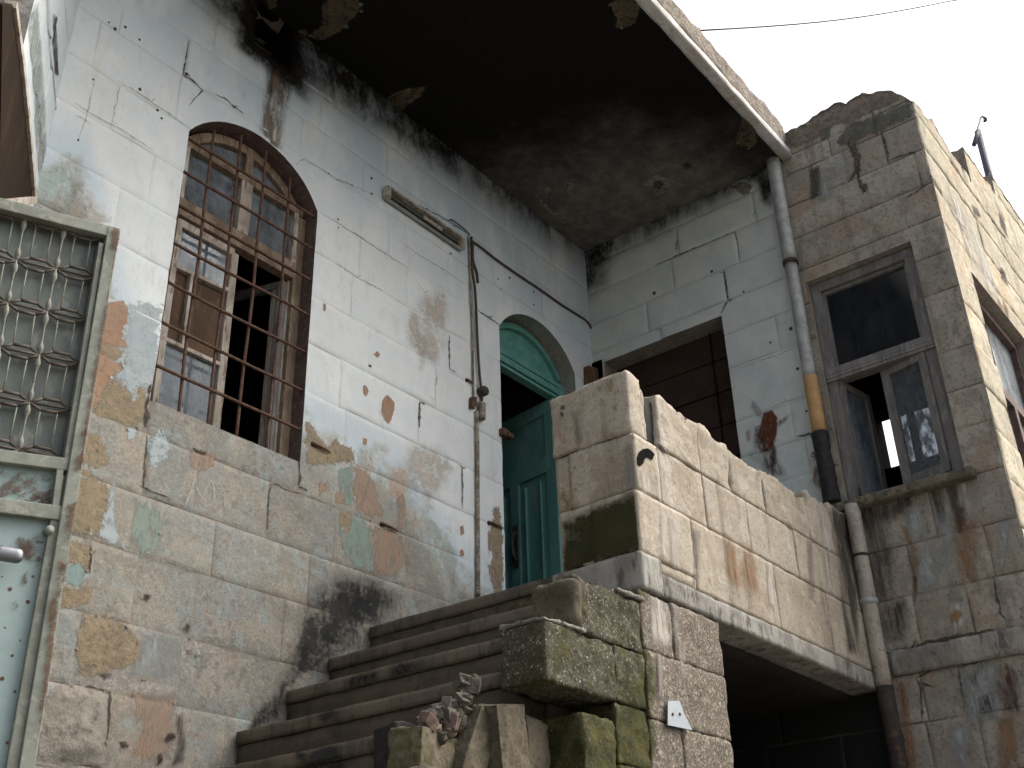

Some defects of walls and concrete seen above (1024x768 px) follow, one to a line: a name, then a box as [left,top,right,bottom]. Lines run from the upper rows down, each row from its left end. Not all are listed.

peeling [298,0,363,40]
peeling [609,0,640,29]
crack [183,42,242,113]
water stain [263,66,304,148]
peeling [92,301,163,440]
peeling [382,395,395,424]
corrosion [748,403,782,474]
peeling [305,422,409,577]
peeling [488,506,504,593]
spalling [60,586,174,681]
water stain [252,581,393,727]